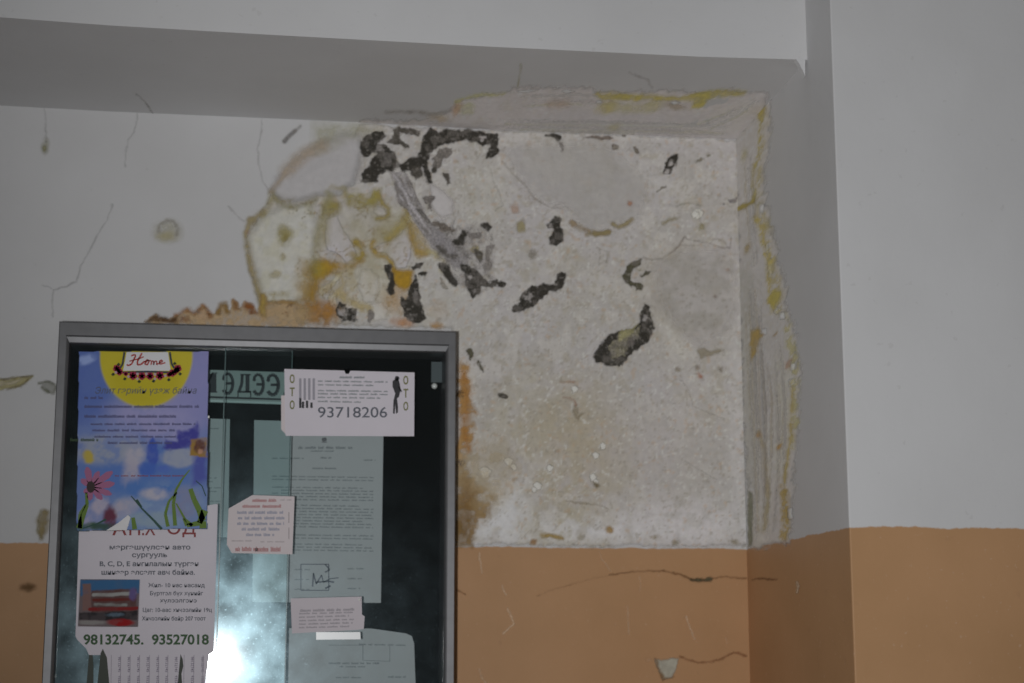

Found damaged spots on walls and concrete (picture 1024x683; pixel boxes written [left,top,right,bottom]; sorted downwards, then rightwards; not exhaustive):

damp [598,90,742,112]
damp [657,154,678,192]
damp [244,213,261,304]
damp [279,228,290,255]
damp [622,259,650,290]
damp [755,218,781,309]
peeling [247,86,802,549]
damp [593,304,655,367]
peeling [0,376,55,393]
damp [748,474,788,546]
crack [663,570,712,582]
flaking render [655,658,678,680]